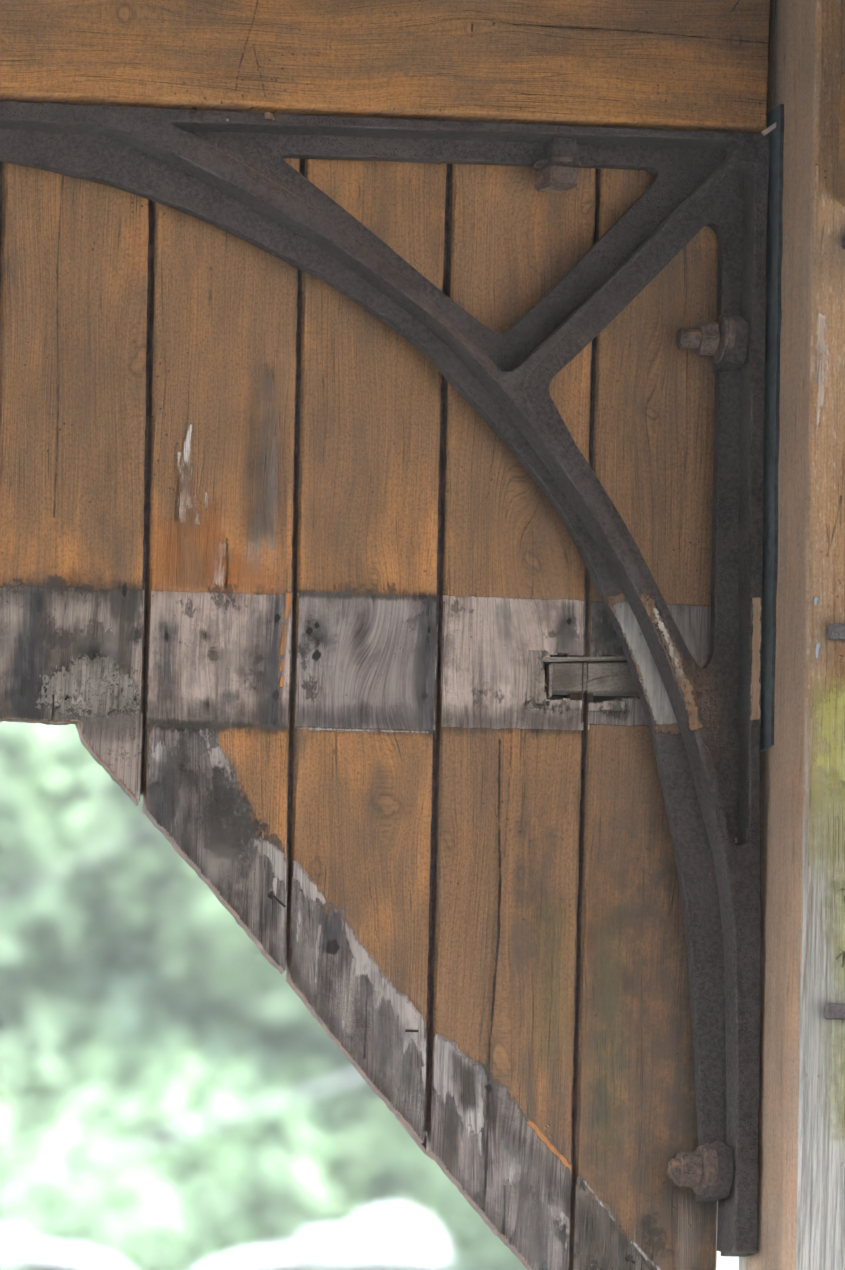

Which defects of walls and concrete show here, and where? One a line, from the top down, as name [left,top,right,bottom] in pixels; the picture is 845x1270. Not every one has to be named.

damp [177,424,228,588]
damp [5,586,49,717]
damp [111,583,138,688]
rust [605,592,703,735]
damp [149,783,168,831]
damp [191,763,485,1156]
damp [551,1208,569,1251]
damp [641,1192,699,1270]